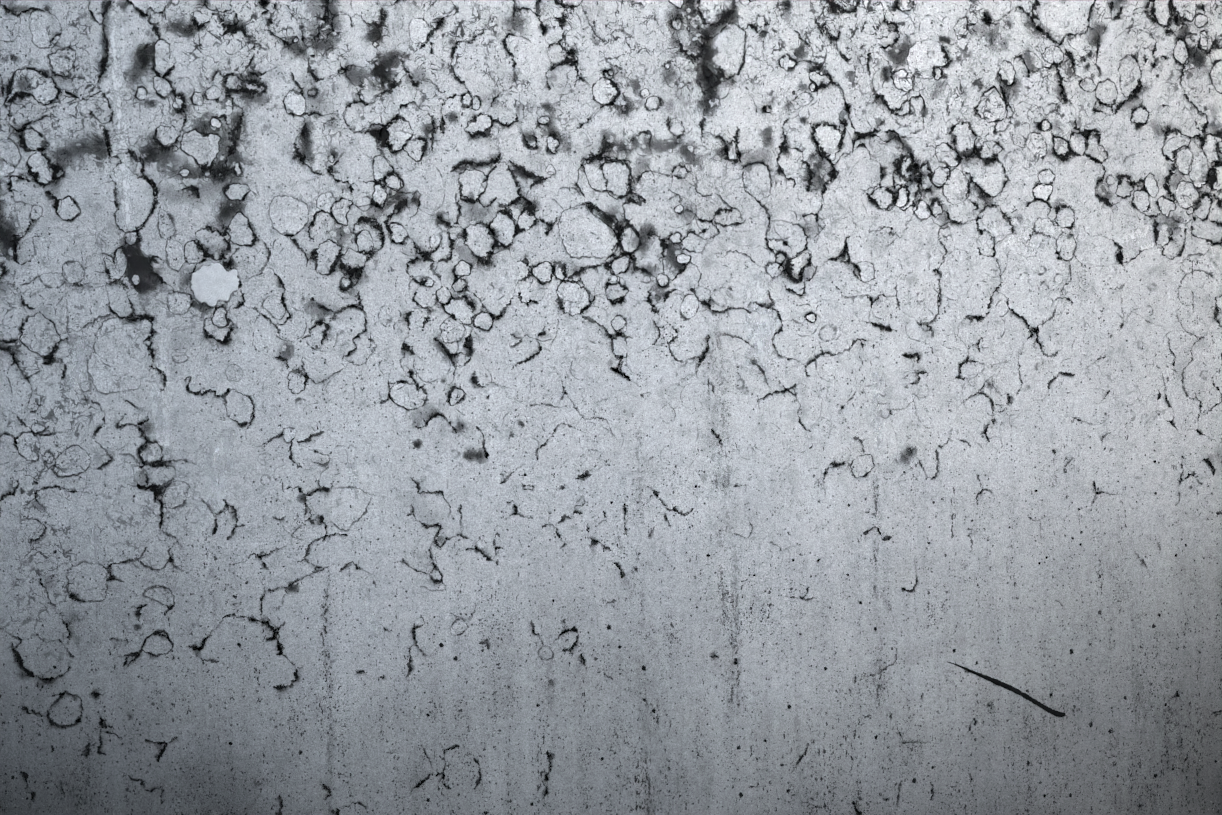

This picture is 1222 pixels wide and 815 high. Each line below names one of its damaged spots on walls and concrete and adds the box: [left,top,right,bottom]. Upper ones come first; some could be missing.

leakage [684,0,716,113]
crack [1003,0,1222,514]
crack [0,0,1086,679]
crack [266,618,303,692]
crack [0,628,177,804]
crack [544,750,554,794]
crack [896,780,935,805]